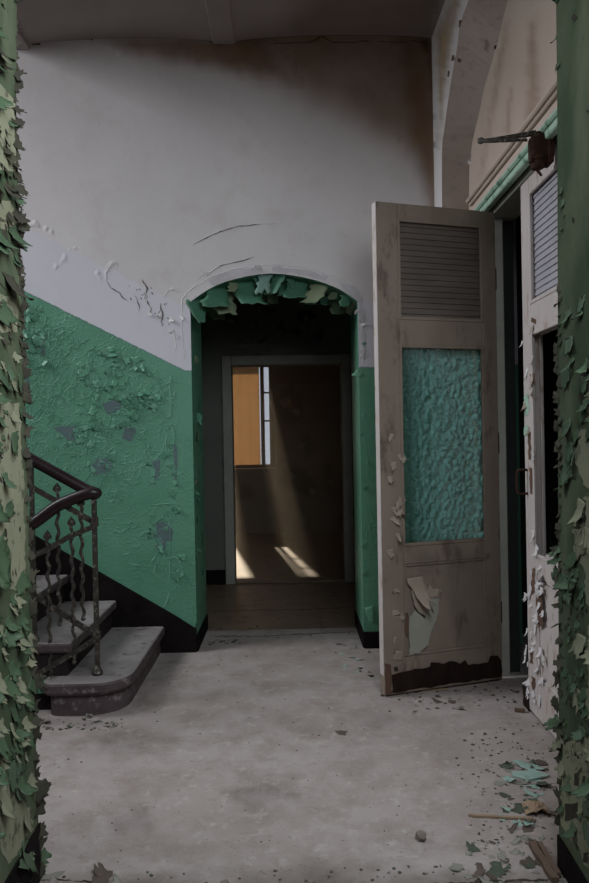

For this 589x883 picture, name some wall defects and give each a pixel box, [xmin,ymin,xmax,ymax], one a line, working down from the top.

crack [194,223,301,258]
peeling [166,264,367,377]
peeling [0,19,65,882]
peeling [76,346,162,442]
peeling [510,282,589,868]
peeling [92,862,122,883]